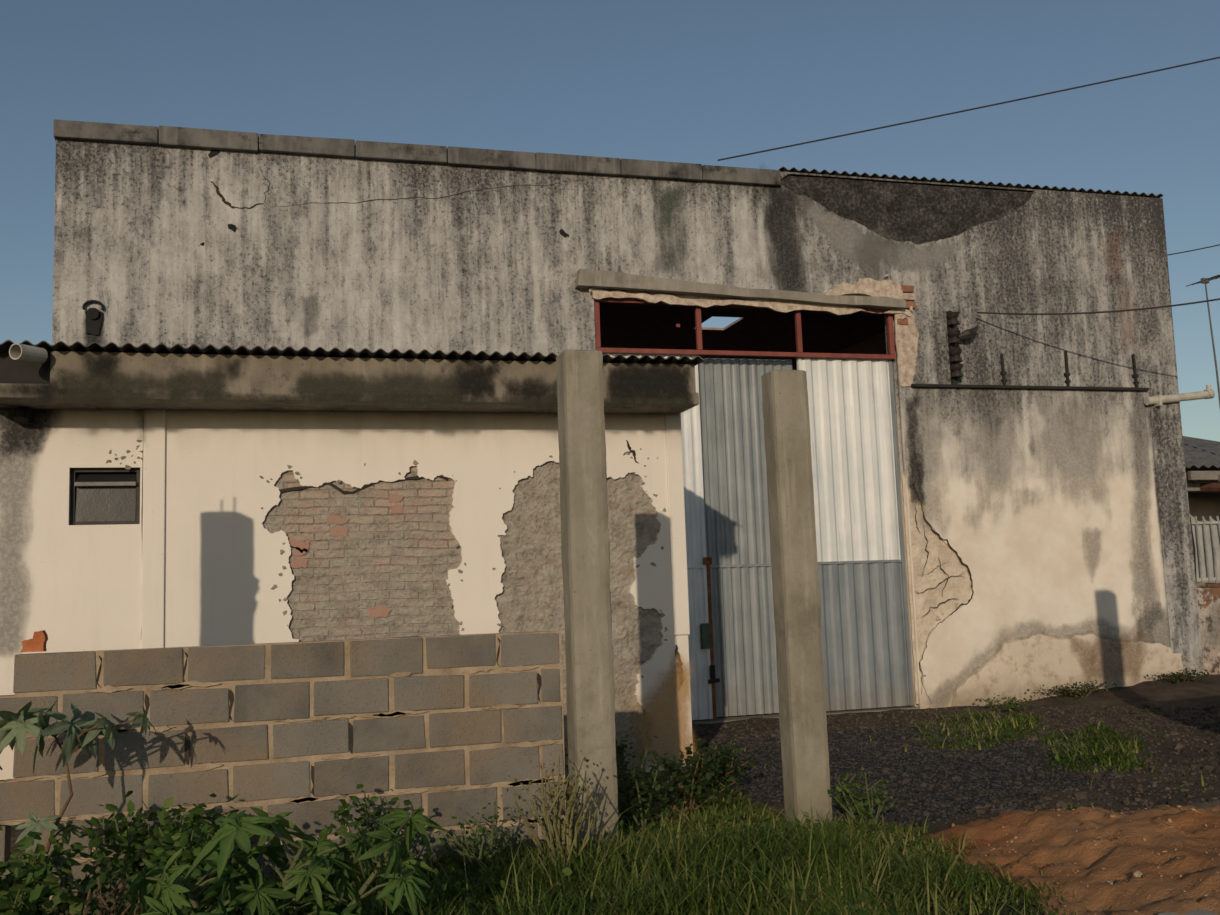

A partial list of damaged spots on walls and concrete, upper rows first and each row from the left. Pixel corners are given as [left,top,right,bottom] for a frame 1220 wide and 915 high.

crack [211,166,618,209]
leakage [658,190,685,267]
leakage [765,185,804,292]
spalling [781,176,1032,245]
leakage [0,319,558,454]
leakage [604,362,693,410]
spalling [589,274,919,387]
leakage [907,398,924,503]
spalling [259,460,466,642]
spalling [492,455,569,778]
spalling [607,449,668,773]
spalling [902,472,971,704]